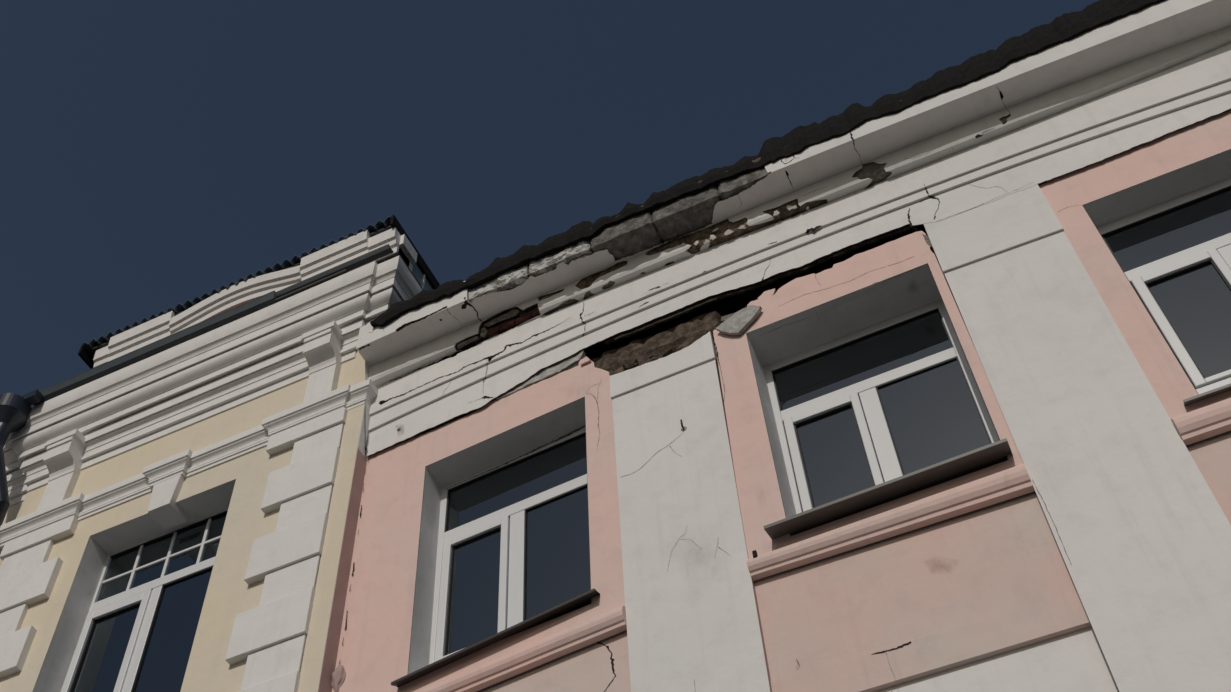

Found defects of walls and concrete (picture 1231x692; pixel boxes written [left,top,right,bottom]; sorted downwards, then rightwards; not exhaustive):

spalling [853,162,892,189]
spalling [646,199,828,266]
crack [760,145,1033,336]
spalling [436,261,627,364]
spalling [495,225,943,400]
crack [711,332,725,398]
crack [596,642,616,692]
crack [873,641,911,692]